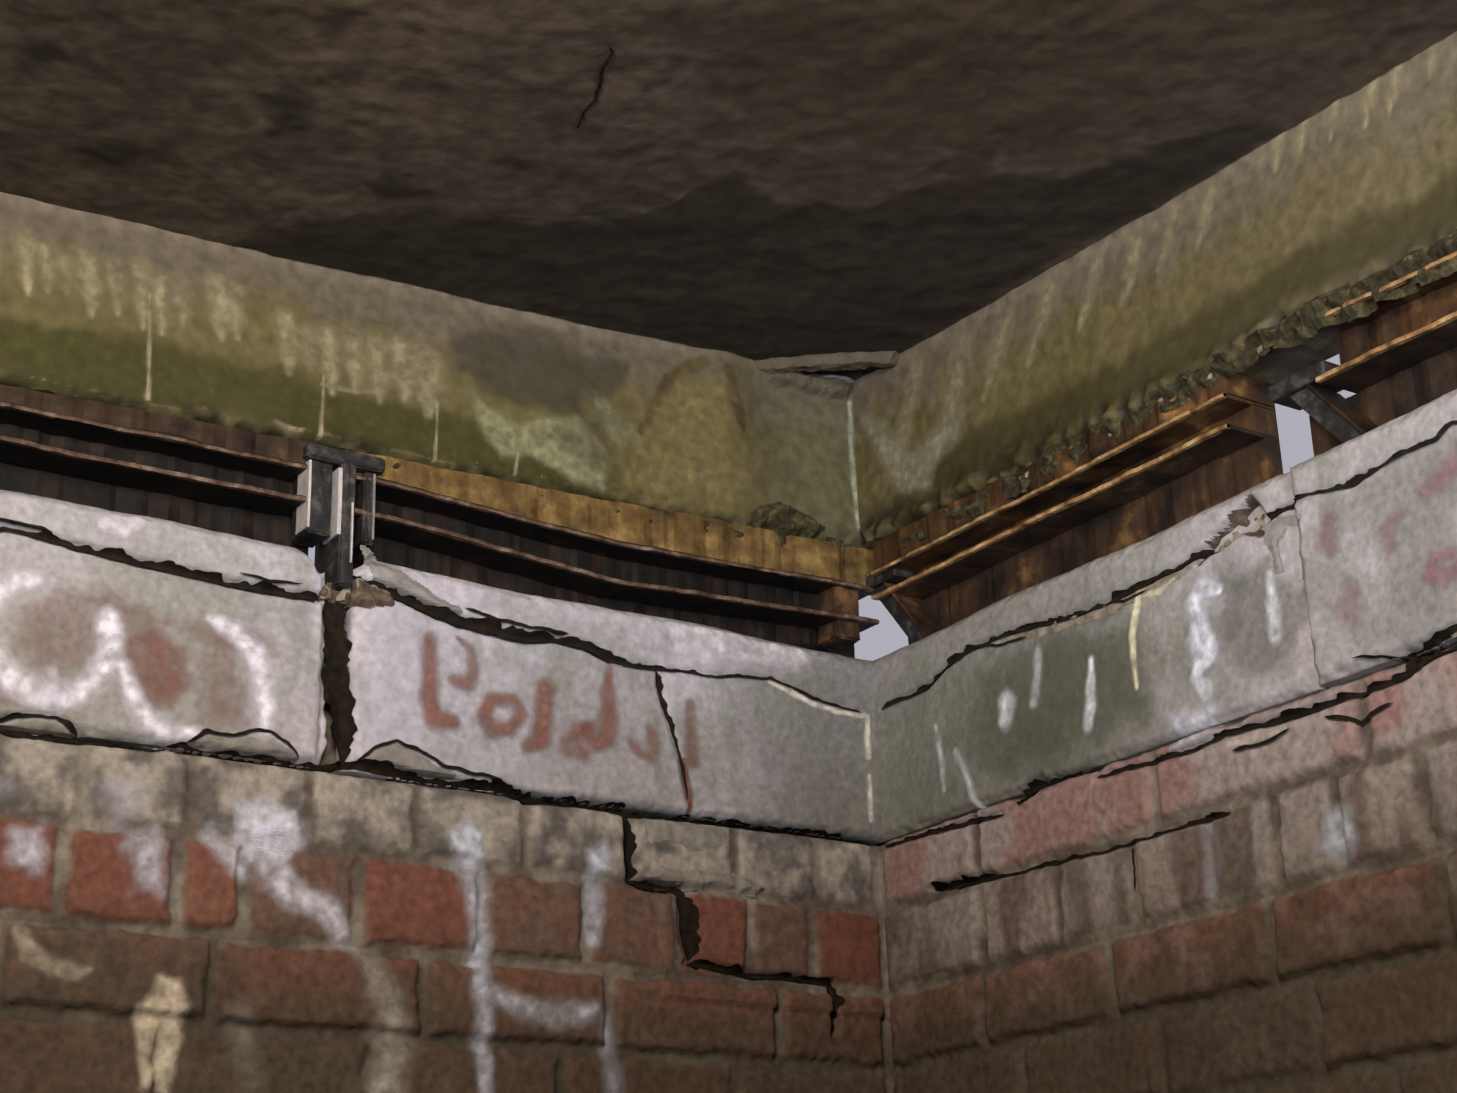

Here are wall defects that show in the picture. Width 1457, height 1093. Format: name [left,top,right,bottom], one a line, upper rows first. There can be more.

crack [577,46,615,130]
damp [16,237,120,317]
damp [133,264,186,401]
damp [277,312,438,462]
damp [98,513,147,538]
damp [296,460,312,535]
damp [323,467,354,563]
damp [476,397,652,489]
damp [847,401,860,530]
crack [1267,420,1457,523]
crack [0,518,1457,1033]
damp [1225,727,1286,748]